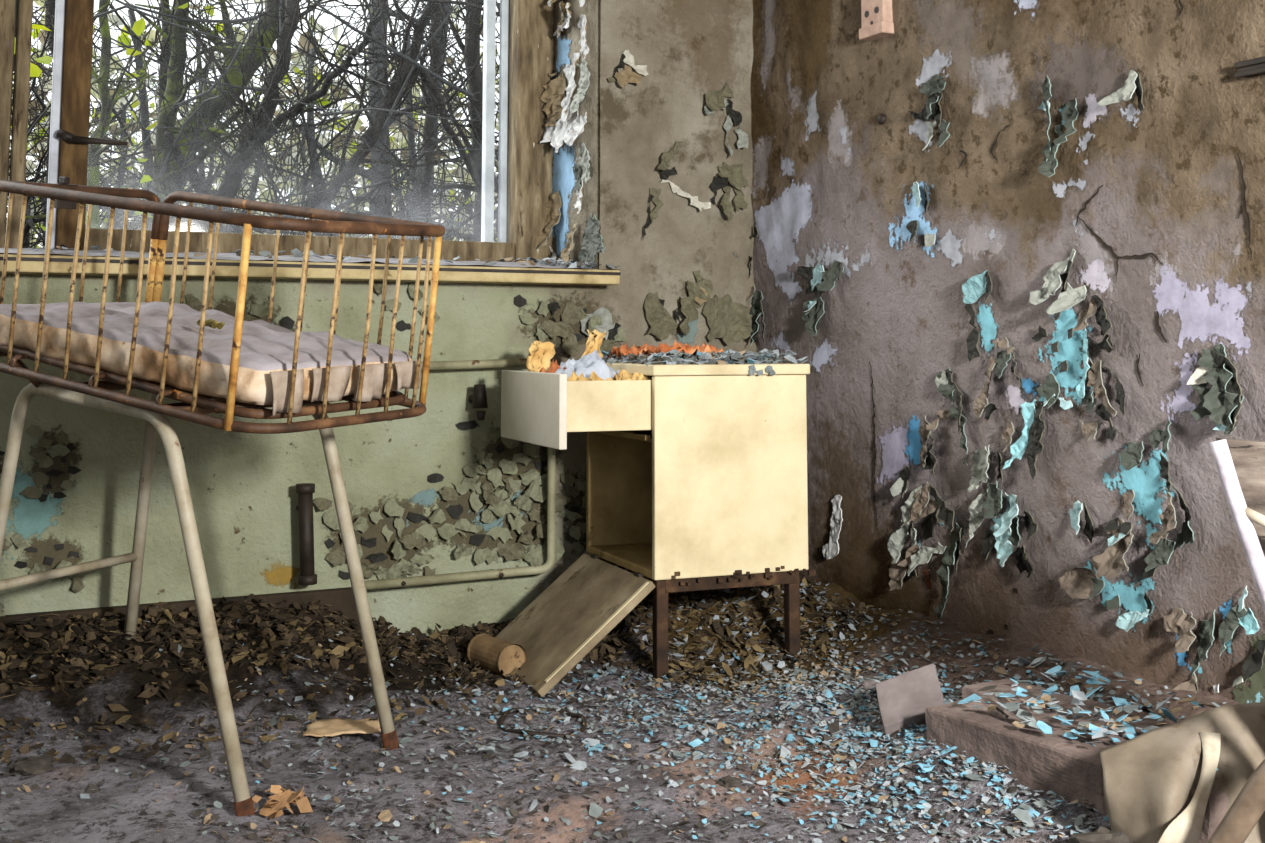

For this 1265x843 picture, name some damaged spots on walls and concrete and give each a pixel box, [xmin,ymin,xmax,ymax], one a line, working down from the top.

peeling [392,0,620,269]
peeling [607,50,649,88]
peeling [908,49,952,152]
peeling [1037,70,1144,199]
peeling [514,83,872,376]
peeling [888,182,963,271]
crack [1075,185,1163,283]
peeling [185,293,296,332]
peeling [0,424,85,593]
peeling [233,217,1265,843]